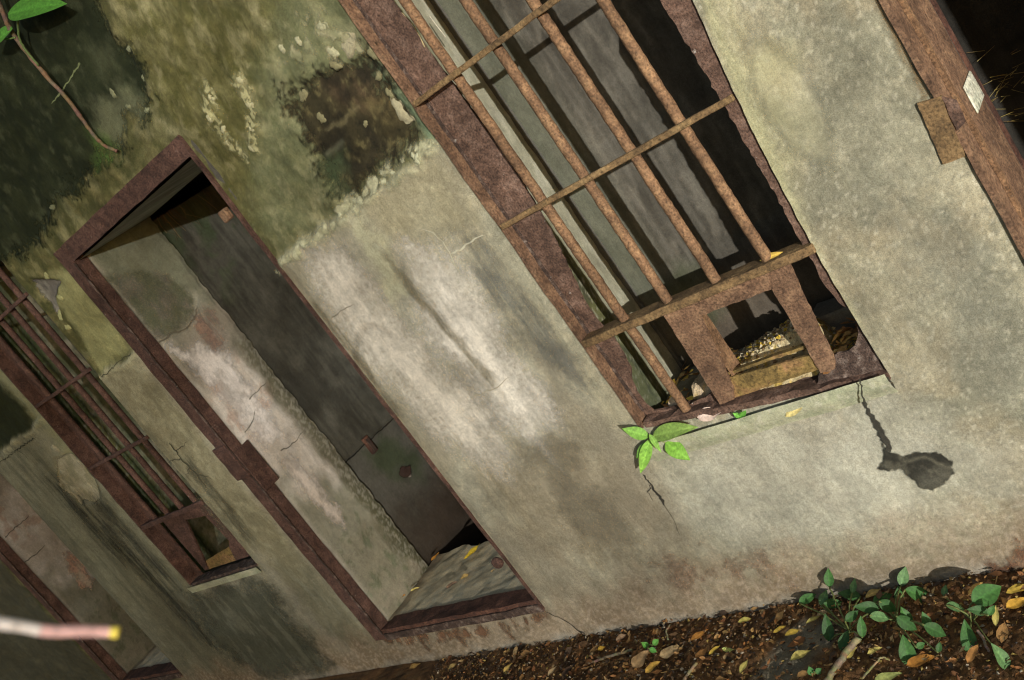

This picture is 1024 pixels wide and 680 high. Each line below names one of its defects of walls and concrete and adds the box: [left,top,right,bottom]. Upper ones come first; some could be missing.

peeling [202,72,261,164]
spalling [32,272,72,330]
crack [643,475,680,535]
corrosion [384,612,548,651]